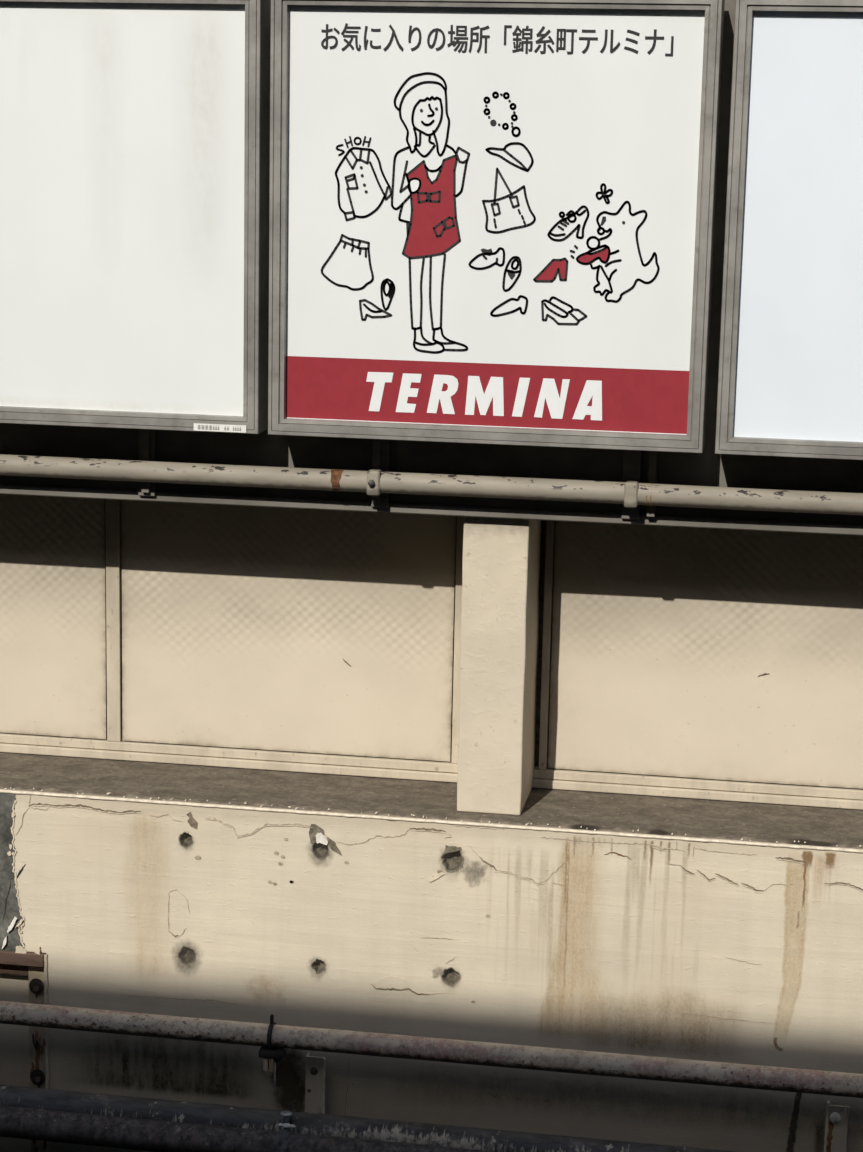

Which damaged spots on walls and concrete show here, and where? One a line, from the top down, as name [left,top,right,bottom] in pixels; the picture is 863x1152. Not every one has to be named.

peeling [0,788,41,955]
crack [16,799,311,838]
spalling [309,824,349,864]
crack [336,825,804,893]
rust [786,852,835,949]
crack [824,882,863,892]